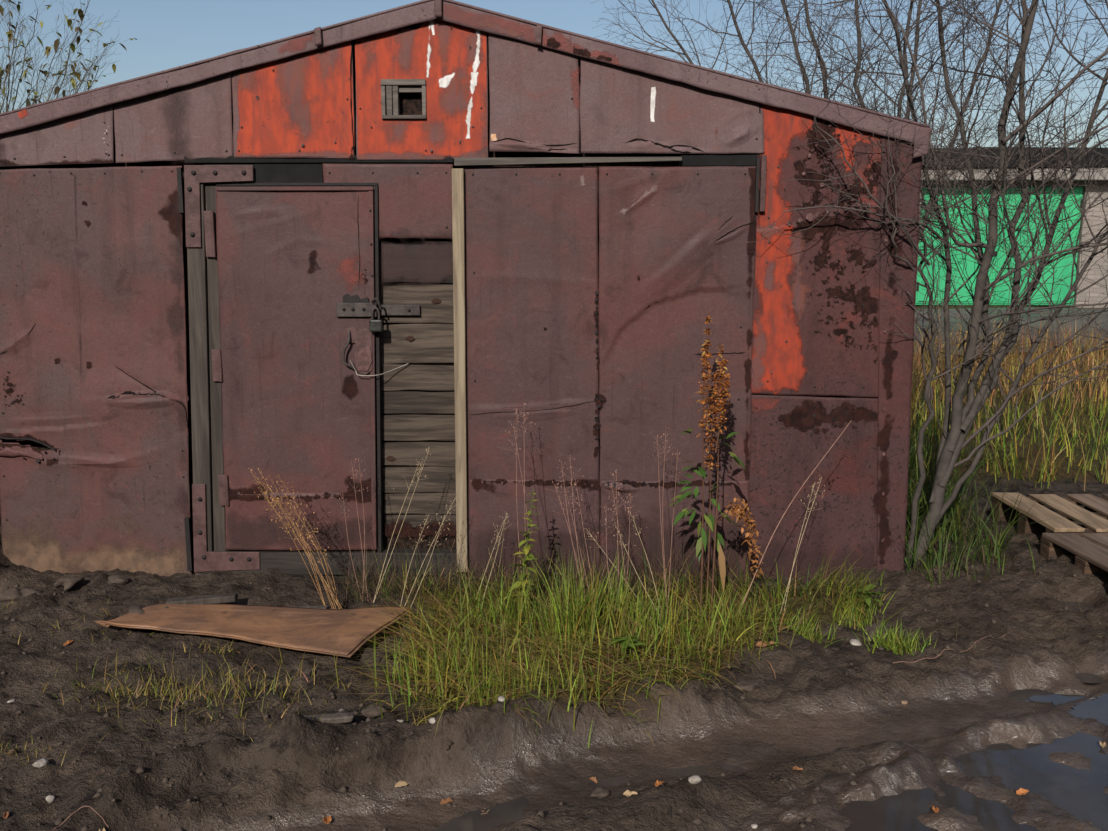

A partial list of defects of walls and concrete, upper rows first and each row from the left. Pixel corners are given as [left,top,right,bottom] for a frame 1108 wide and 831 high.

corrosion [747,168,757,297]
peeling [751,104,881,410]
corrosion [744,359,752,403]
corrosion [778,121,901,564]
corrosion [472,432,750,492]